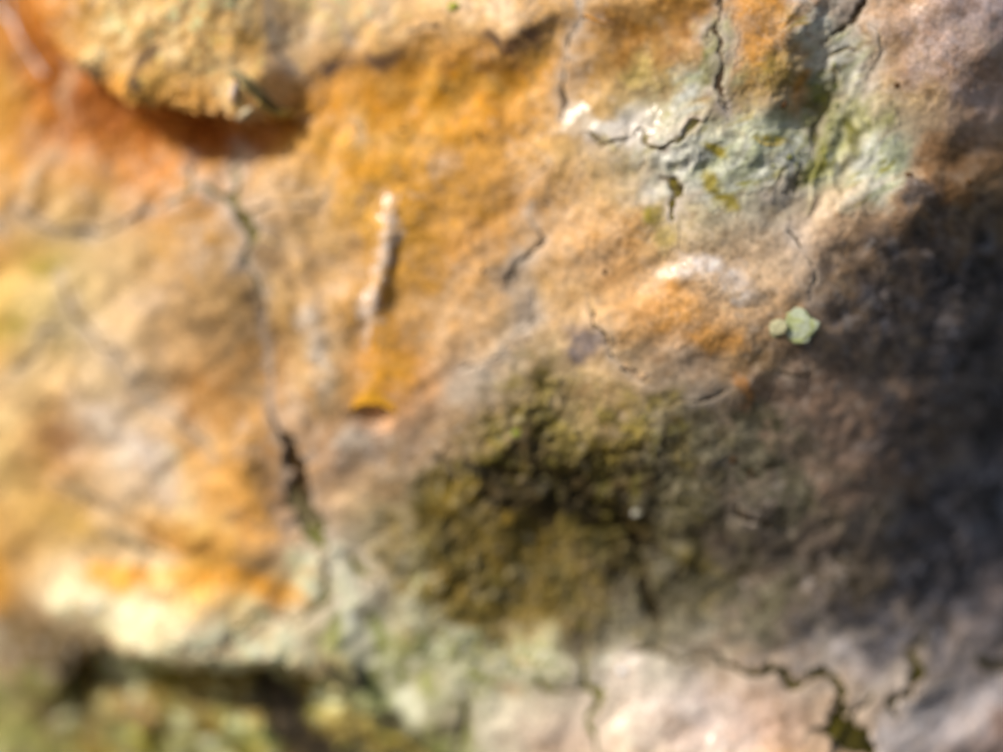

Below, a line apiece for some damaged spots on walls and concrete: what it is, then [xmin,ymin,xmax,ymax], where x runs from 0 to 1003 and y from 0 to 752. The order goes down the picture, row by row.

crack [560,2,587,120]
water stain [574,0,795,78]
crack [706,0,730,112]
crack [826,0,881,80]
crack [589,118,700,151]
crack [801,103,830,142]
crack [190,146,270,296]
water stain [304,18,1003,716]
crack [166,549,382,663]
crack [537,642,605,752]
crack [630,634,927,752]